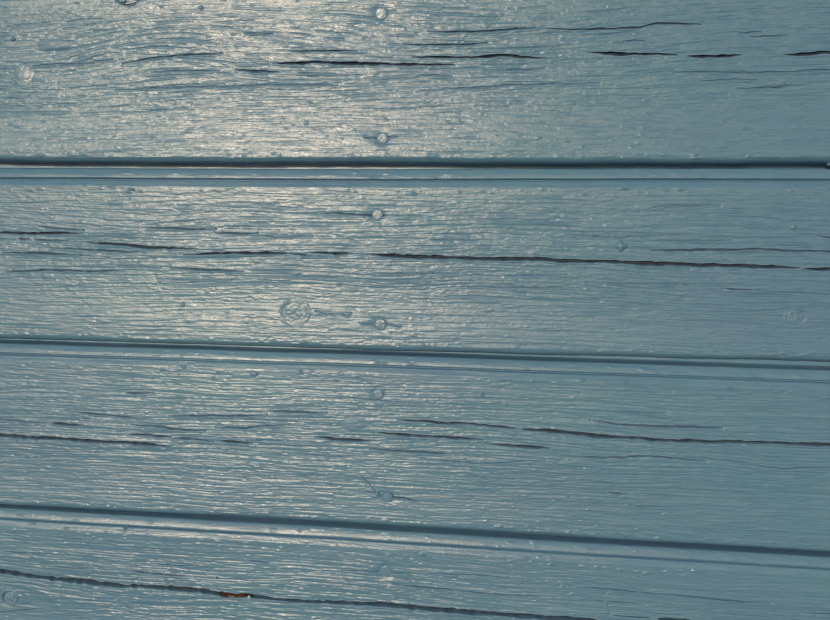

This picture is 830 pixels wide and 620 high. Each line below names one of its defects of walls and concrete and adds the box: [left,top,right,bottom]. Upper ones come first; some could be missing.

crack [0,21,830,92]
crack [321,211,408,219]
crack [639,203,721,213]
crack [0,224,830,297]
crack [0,391,830,471]
crack [0,549,771,620]